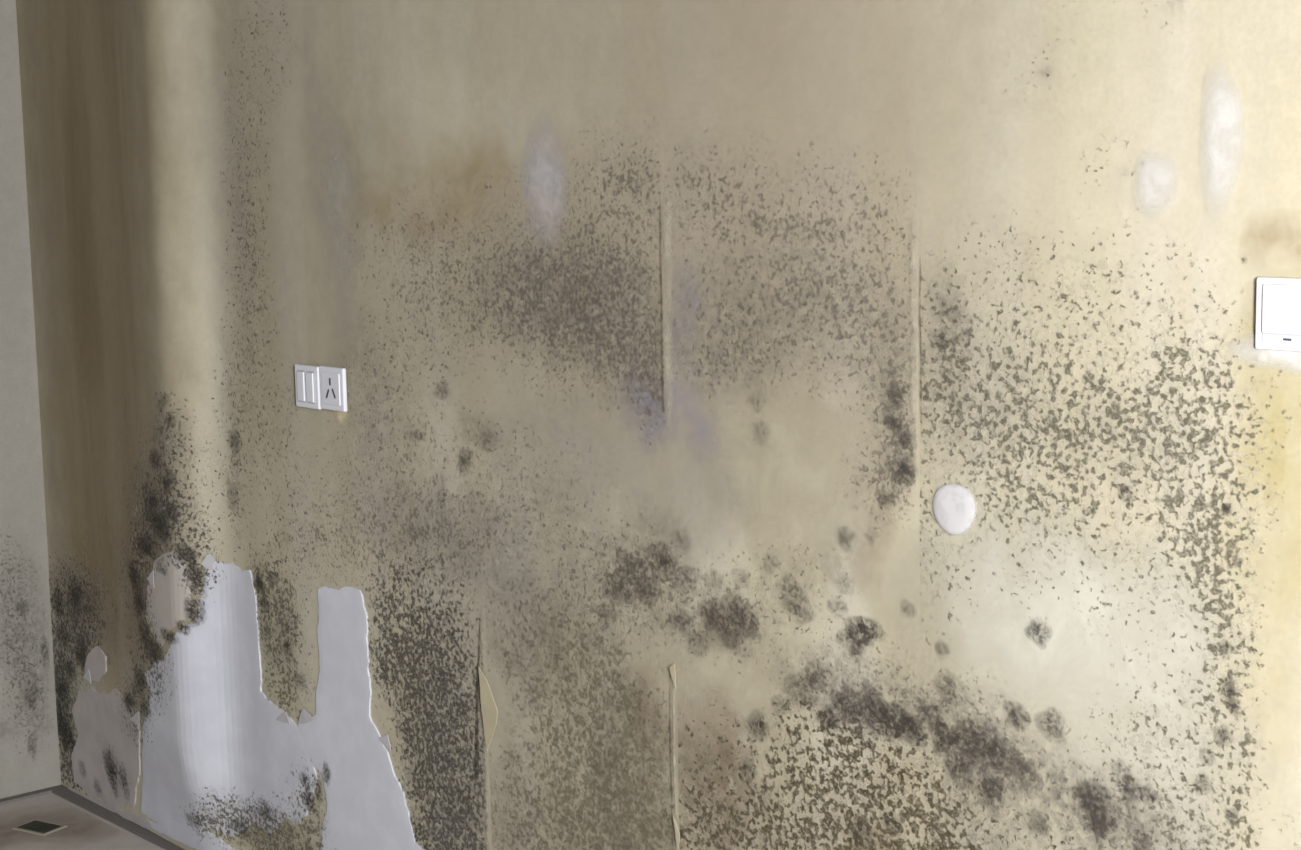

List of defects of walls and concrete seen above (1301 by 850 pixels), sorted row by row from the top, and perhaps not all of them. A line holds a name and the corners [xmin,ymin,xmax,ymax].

damp [0,0,336,789]
peeling [68,551,425,850]
damp [234,143,1270,850]